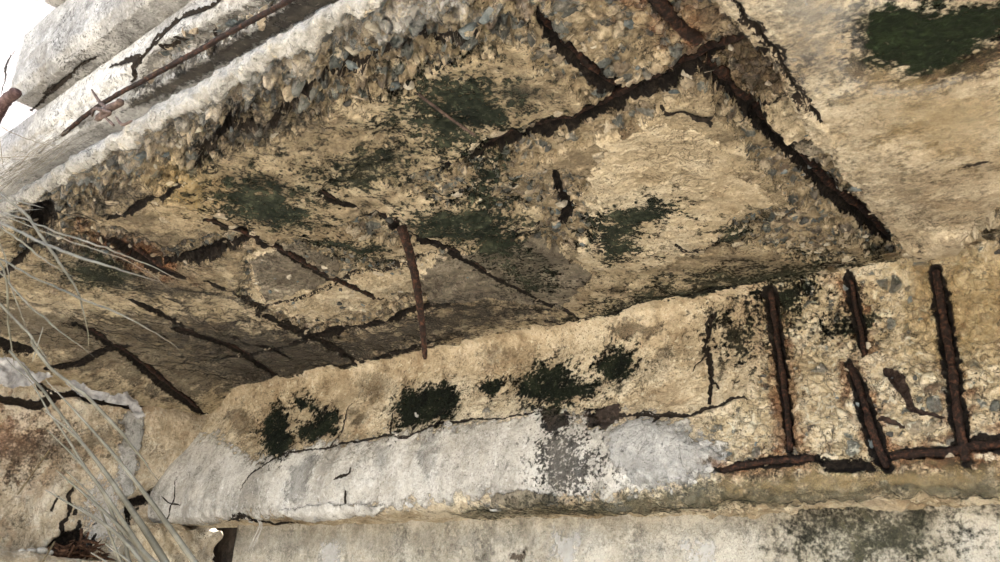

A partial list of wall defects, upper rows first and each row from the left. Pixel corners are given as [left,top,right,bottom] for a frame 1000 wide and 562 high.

crack [29,0,221,112]
damp [842,10,1000,99]
damp [60,185,153,220]
spalling [11,0,903,360]
crack [0,383,143,411]
peeling [128,407,698,526]
damp [516,403,626,511]
crack [551,284,752,422]
rust [715,339,814,481]
spalling [696,225,1000,474]
rust [878,416,905,429]
rust [883,368,944,419]